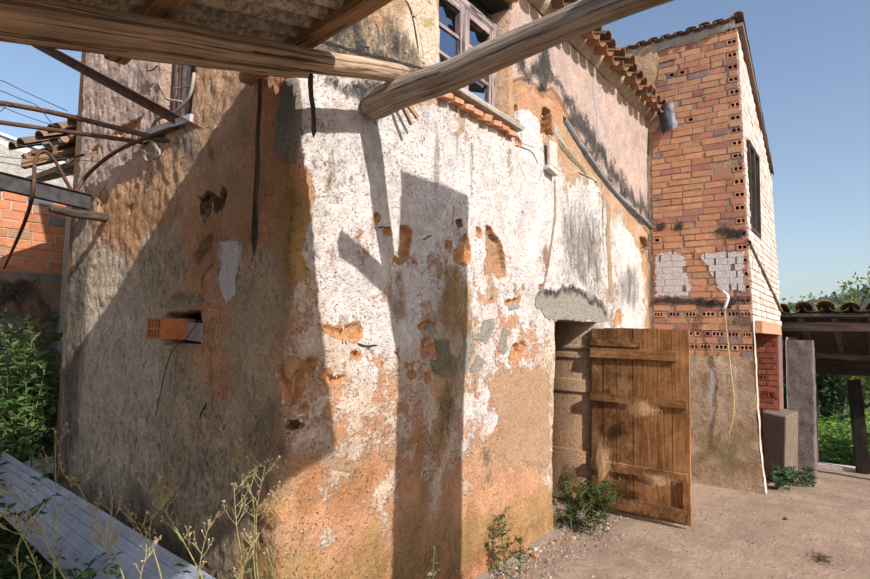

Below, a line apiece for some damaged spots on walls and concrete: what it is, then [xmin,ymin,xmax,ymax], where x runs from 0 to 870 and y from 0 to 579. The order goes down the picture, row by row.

crack [323,0,435,68]
flaking render [513,80,555,137]
leakage [517,49,665,231]
flaking render [374,211,412,267]
flaking render [445,219,526,306]
leakage [540,180,635,315]
leakage [651,296,752,308]
peeling [701,251,746,292]
flaking render [317,321,363,362]
flaking render [405,318,438,383]
flaking render [275,356,347,430]
flaking render [482,341,551,472]